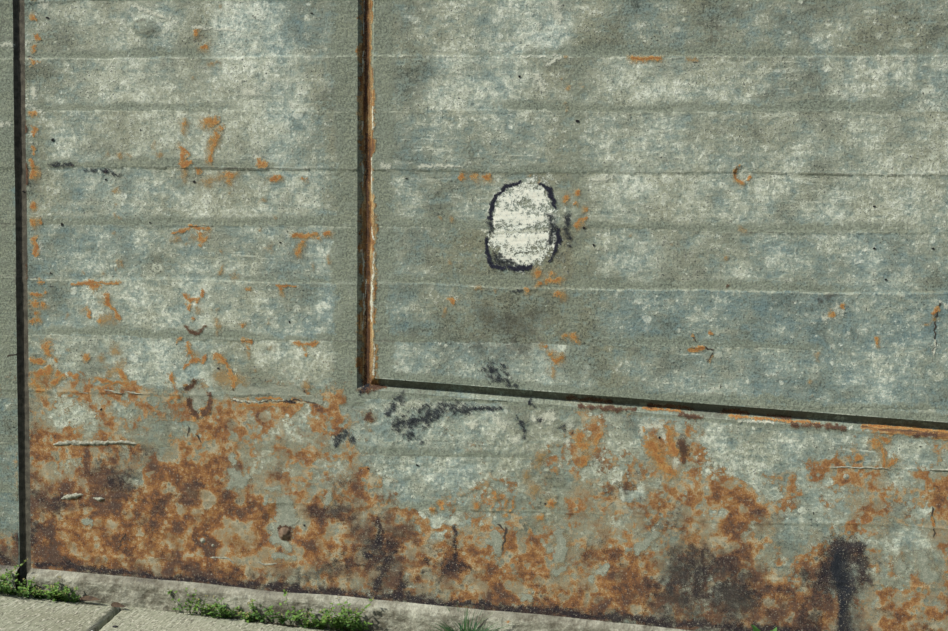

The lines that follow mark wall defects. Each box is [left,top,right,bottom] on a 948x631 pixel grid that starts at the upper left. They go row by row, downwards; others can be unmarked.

rust [25,87,42,185]
rust [25,201,43,267]
rust [171,224,210,247]
rust [177,116,237,194]
rust [253,151,283,182]
rust [289,231,332,258]
rust [351,0,387,397]
rust [29,279,47,325]
rust [28,289,948,631]
water stain [34,517,803,631]
water stain [816,536,873,631]